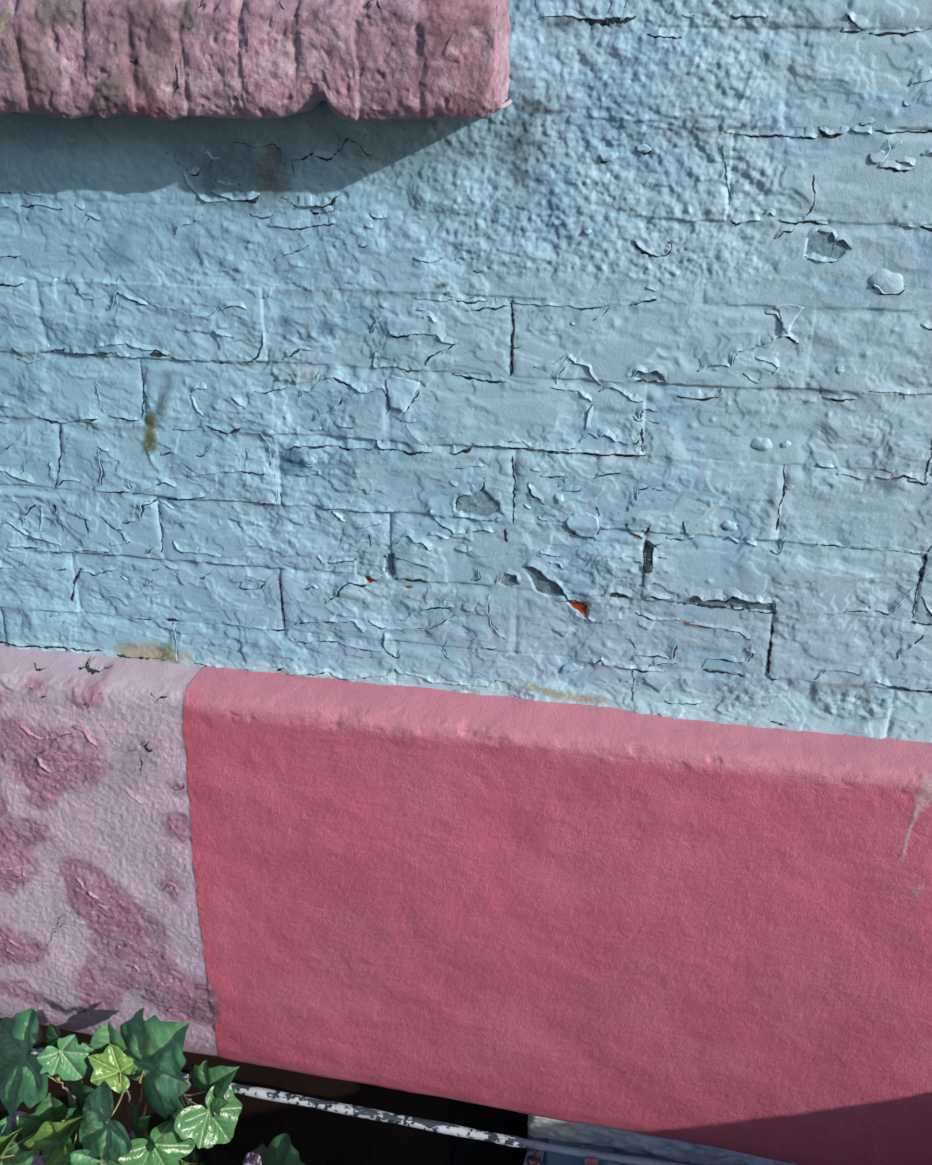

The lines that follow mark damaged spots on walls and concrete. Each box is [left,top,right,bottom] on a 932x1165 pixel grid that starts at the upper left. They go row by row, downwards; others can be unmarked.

peeling [724,117,932,173]
peeling [166,148,340,261]
peeling [731,208,852,263]
peeling [697,304,805,384]
crack [140,369,148,417]
peeling [0,305,669,687]
crack [510,456,518,524]
crack [776,464,796,529]
crack [54,504,130,606]
peeling [601,481,780,668]
crack [844,554,932,659]
crack [767,622,779,681]